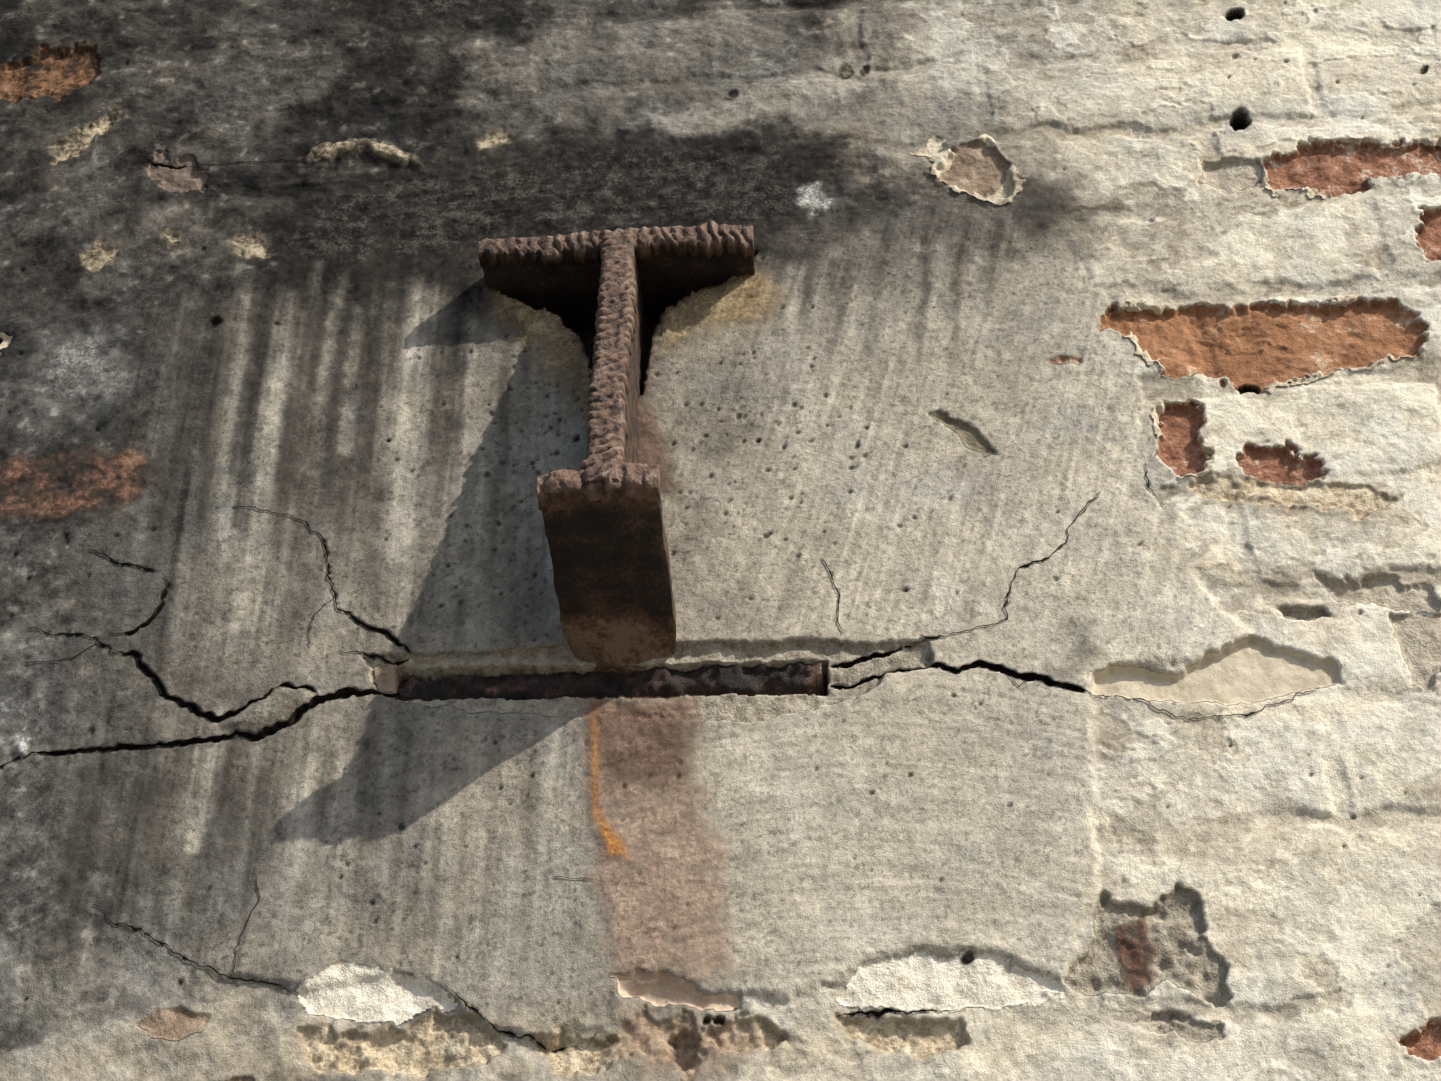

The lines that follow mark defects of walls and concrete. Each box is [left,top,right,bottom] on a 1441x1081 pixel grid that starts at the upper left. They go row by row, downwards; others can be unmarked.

water stain [799,183,831,210]
water stain [277,257,325,512]
corrosion [497,294,592,409]
corrosion [659,273,782,353]
flaking render [1100,292,1430,395]
peeling [1150,398,1402,522]
crack [0,506,412,768]
crack [823,492,1319,720]
water stain [15,735,30,755]
corrosion [589,702,728,978]
spalling [296,962,505,1078]
spalling [834,883,1232,1060]